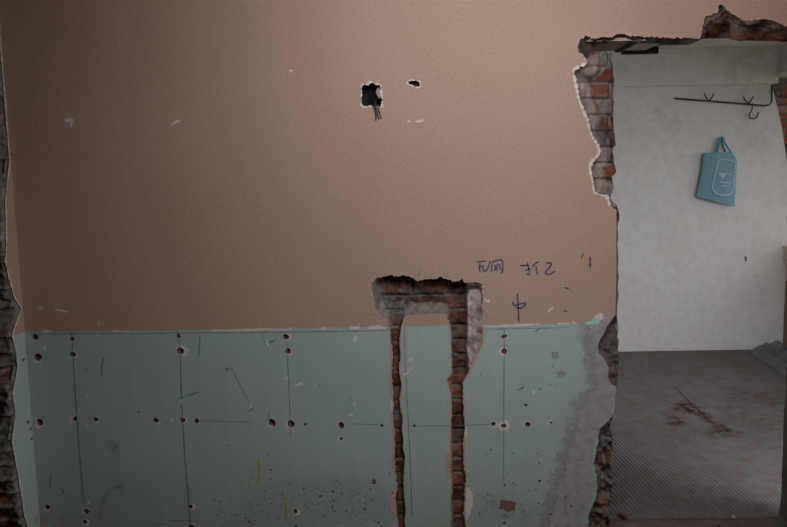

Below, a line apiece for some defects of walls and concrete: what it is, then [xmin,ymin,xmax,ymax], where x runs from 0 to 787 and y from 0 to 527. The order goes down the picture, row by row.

spalling [700,5,787,42]
spalling [360,81,384,108]
spalling [773,84,787,159]
peeling [212,328,293,356]
spalling [350,274,540,527]
peeling [543,313,619,527]